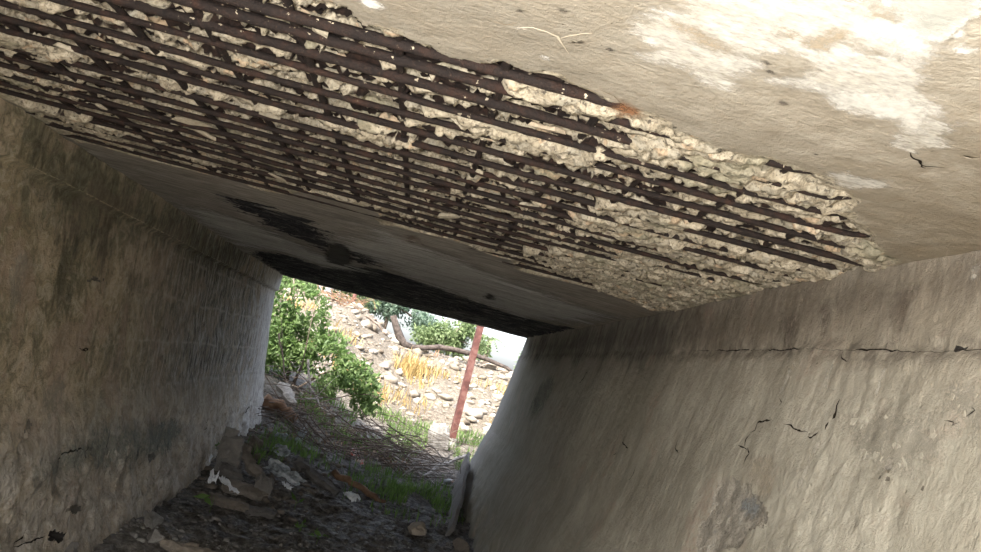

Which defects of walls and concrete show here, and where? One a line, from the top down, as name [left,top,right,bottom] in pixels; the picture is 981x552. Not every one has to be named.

water stain [631,0,981,154]
spalling [0,0,901,312]
crack [910,153,943,168]
water stain [23,126,673,362]
spalling [249,245,575,338]
crack [691,346,981,362]
crack [738,398,839,462]